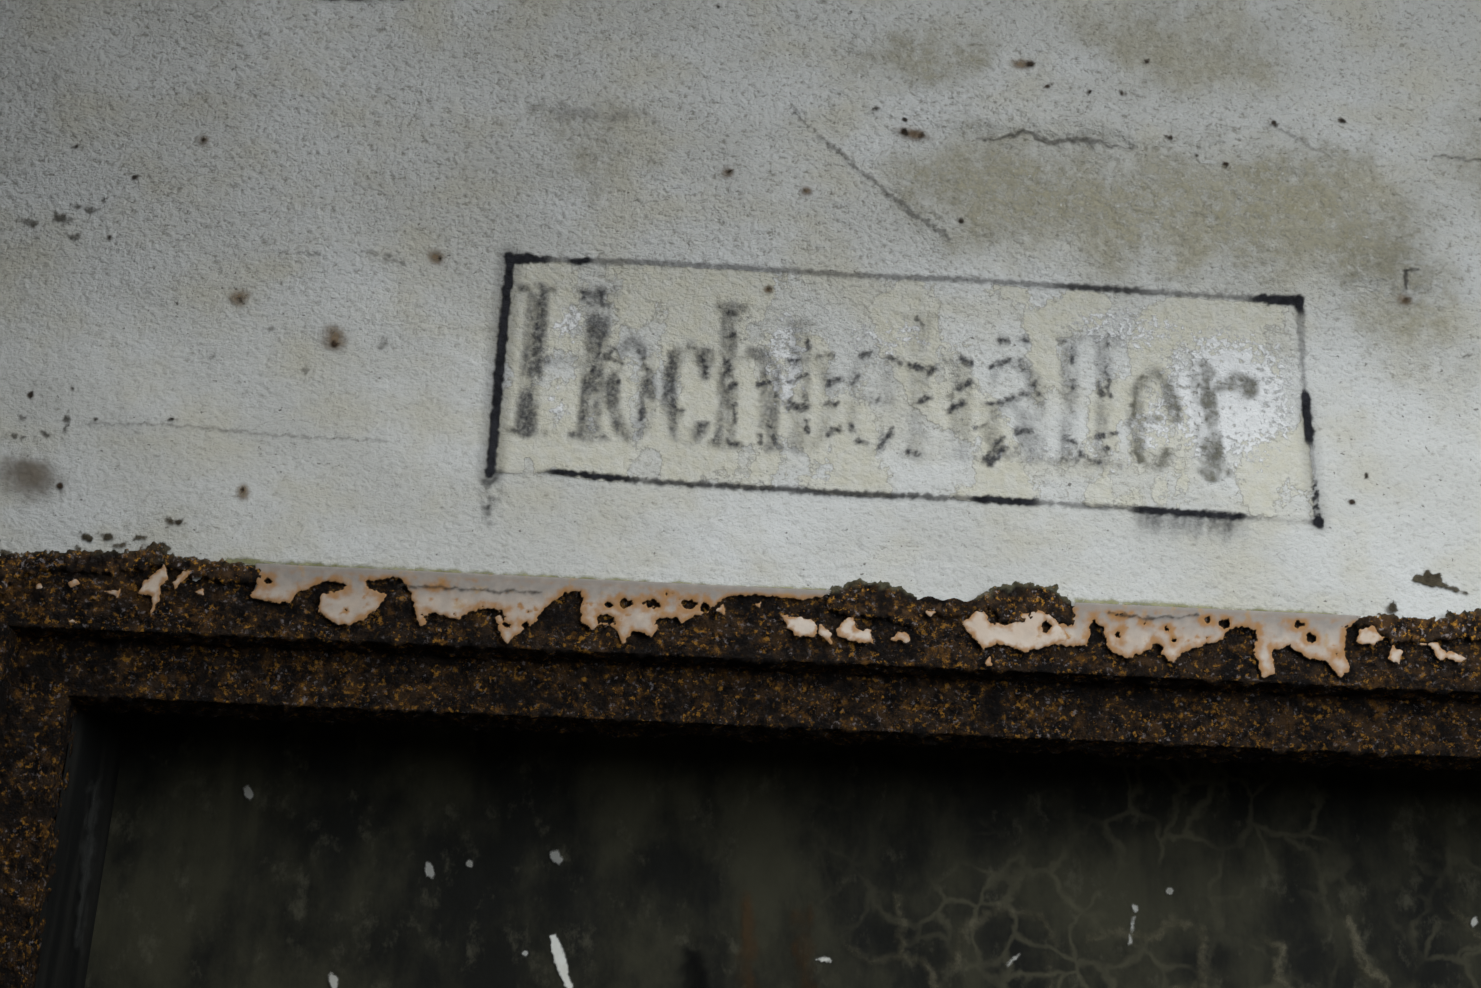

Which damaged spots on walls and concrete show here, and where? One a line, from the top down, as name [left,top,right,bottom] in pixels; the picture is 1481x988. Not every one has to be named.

water stain [914,151,1415,294]
rust [0,541,261,594]
peeling [76,532,204,613]
peeling [250,563,873,644]
peeling [891,632,910,643]
rust [826,578,1076,628]
peeling [962,602,1403,678]
rust [1345,608,1481,644]
peeling [1420,642,1466,662]